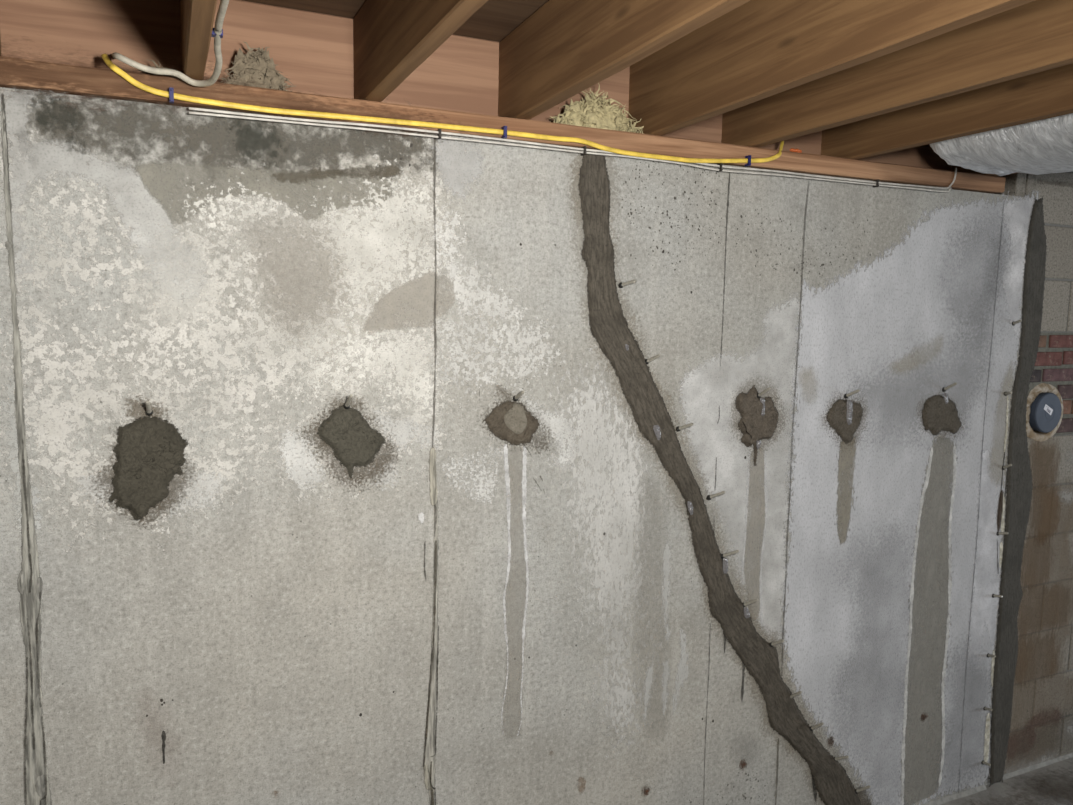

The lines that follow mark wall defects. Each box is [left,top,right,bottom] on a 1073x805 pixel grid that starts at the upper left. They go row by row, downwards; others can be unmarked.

crack [720,172,730,366]
crack [799,205,807,317]
crack [22,442,47,805]
damp [0,57,688,757]
crack [424,541,439,805]
crack [773,738,781,805]
damp [680,191,1041,805]